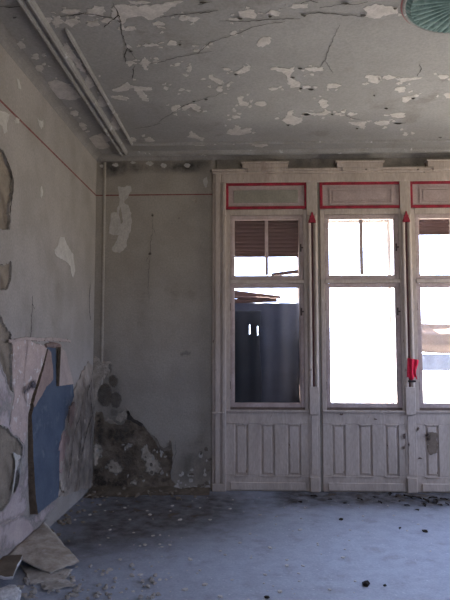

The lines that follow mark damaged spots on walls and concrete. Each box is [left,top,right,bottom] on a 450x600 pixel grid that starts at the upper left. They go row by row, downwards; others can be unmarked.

peeling [45,0,200,34]
crack [155,2,284,63]
peeling [229,4,308,37]
crack [301,0,365,71]
peeling [360,3,402,19]
peeling [48,77,110,149]
peeling [268,65,422,136]
peeling [109,186,132,253]
peeling [54,237,75,277]
flaking render [0,321,10,389]
leakage [98,364,121,407]
flaking render [0,428,23,510]